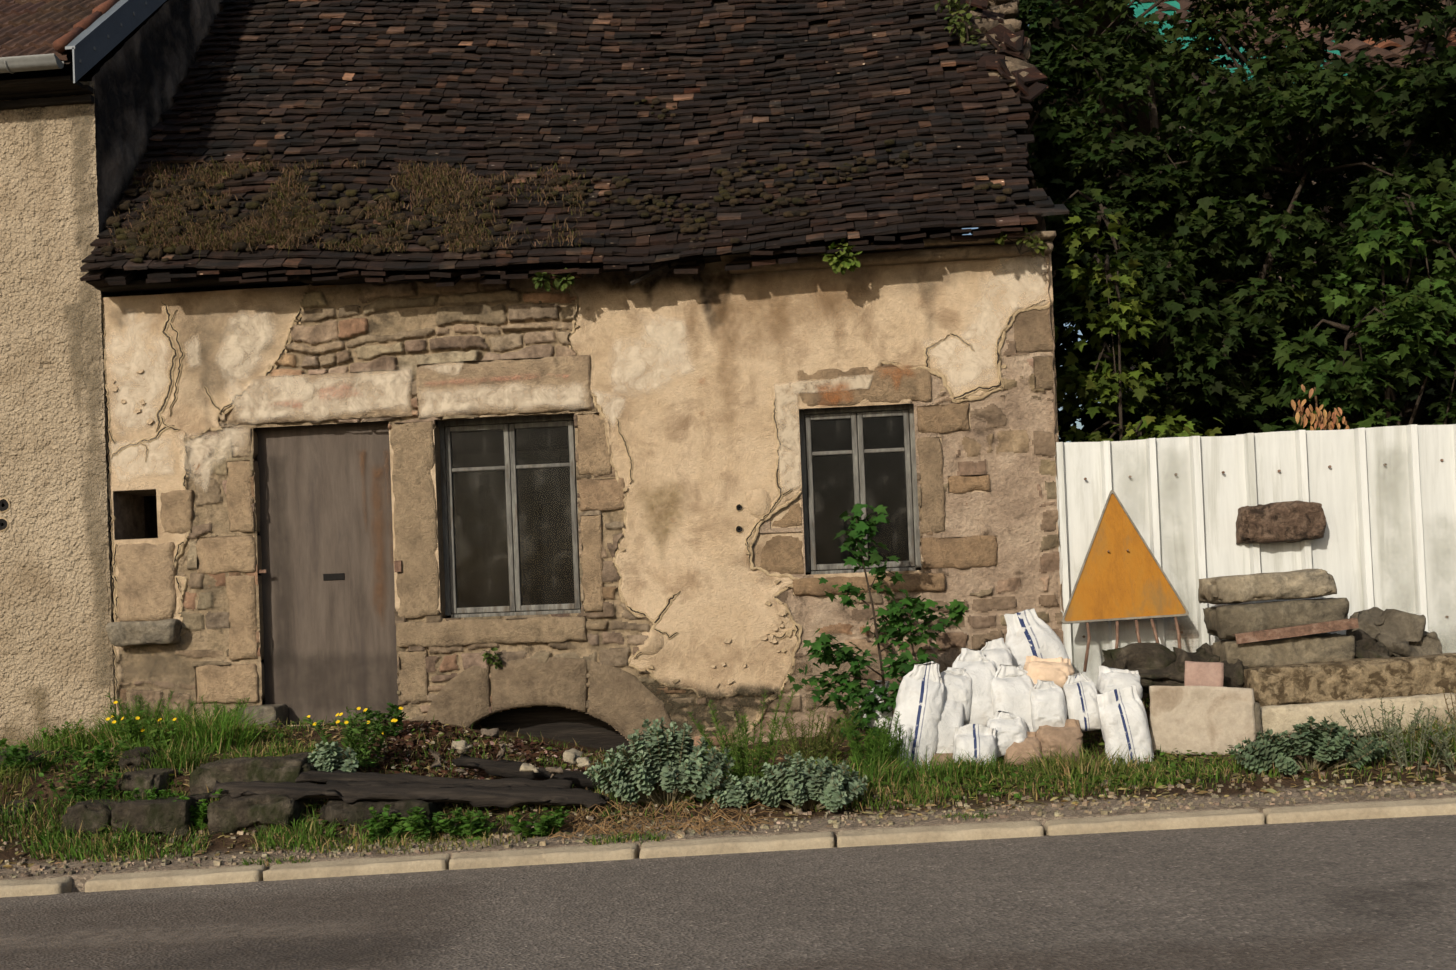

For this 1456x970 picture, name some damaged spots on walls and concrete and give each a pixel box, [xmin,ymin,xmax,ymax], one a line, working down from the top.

water stain [591,268,734,323]
crack [101,301,302,712]
flaking render [111,255,1064,751]